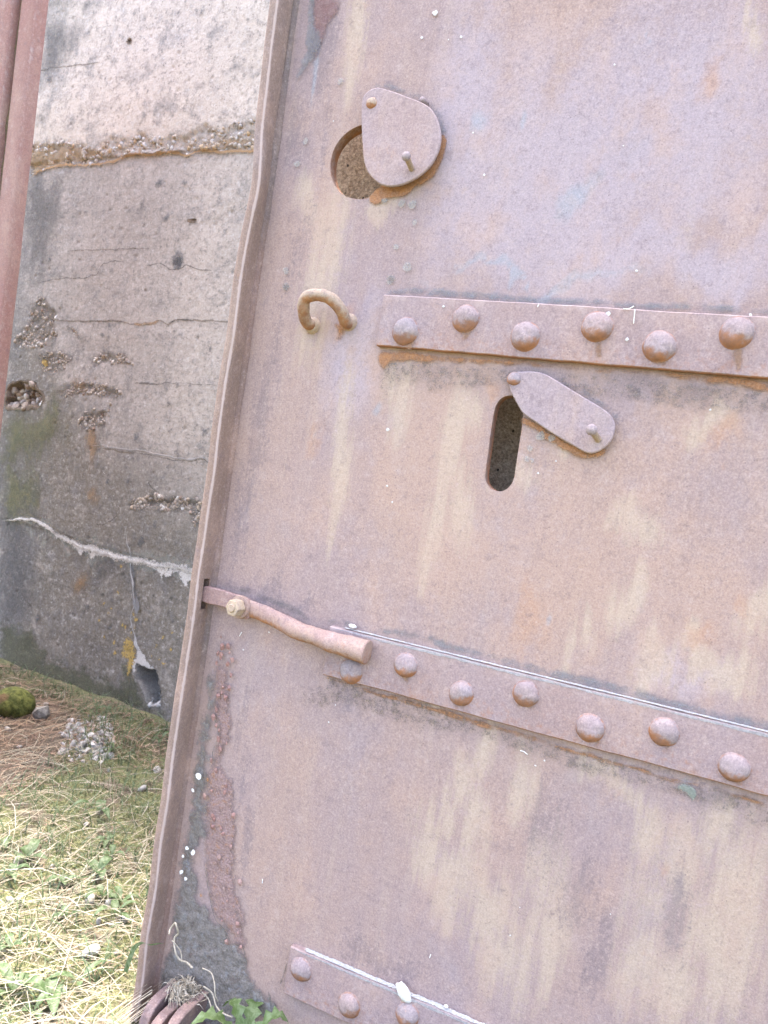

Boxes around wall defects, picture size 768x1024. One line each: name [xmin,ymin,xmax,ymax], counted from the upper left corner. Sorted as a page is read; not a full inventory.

rust [369,135,447,204]
spalling [4,296,82,411]
rust [379,352,514,368]
rust [654,348,768,391]
spalling [58,380,122,432]
spalling [128,492,203,527]
crack [7,514,192,651]
spalling [132,649,162,708]
rust [200,636,247,965]